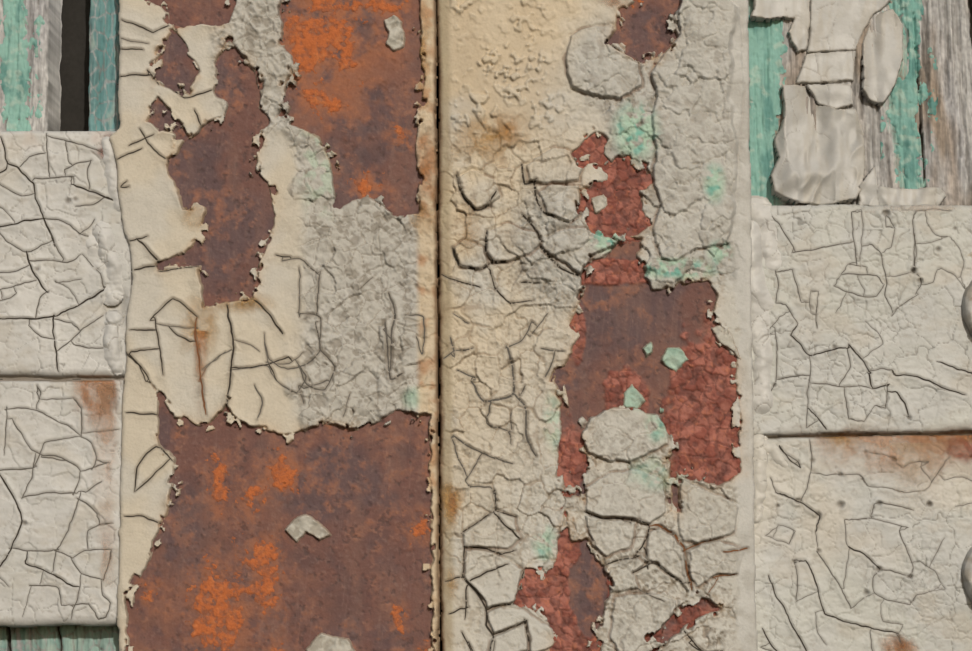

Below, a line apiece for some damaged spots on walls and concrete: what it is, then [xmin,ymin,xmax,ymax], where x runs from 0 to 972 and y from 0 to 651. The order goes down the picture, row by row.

crack [0,386,161,651]
crack [0,128,169,372]
crack [117,20,215,125]
crack [127,255,350,418]
peeling [123,392,436,651]
peeling [145,0,426,307]
crack [358,175,563,651]
crack [521,164,582,278]
peeling [514,132,742,651]
peeling [604,0,680,65]
crack [584,78,972,651]
peeling [750,0,946,206]